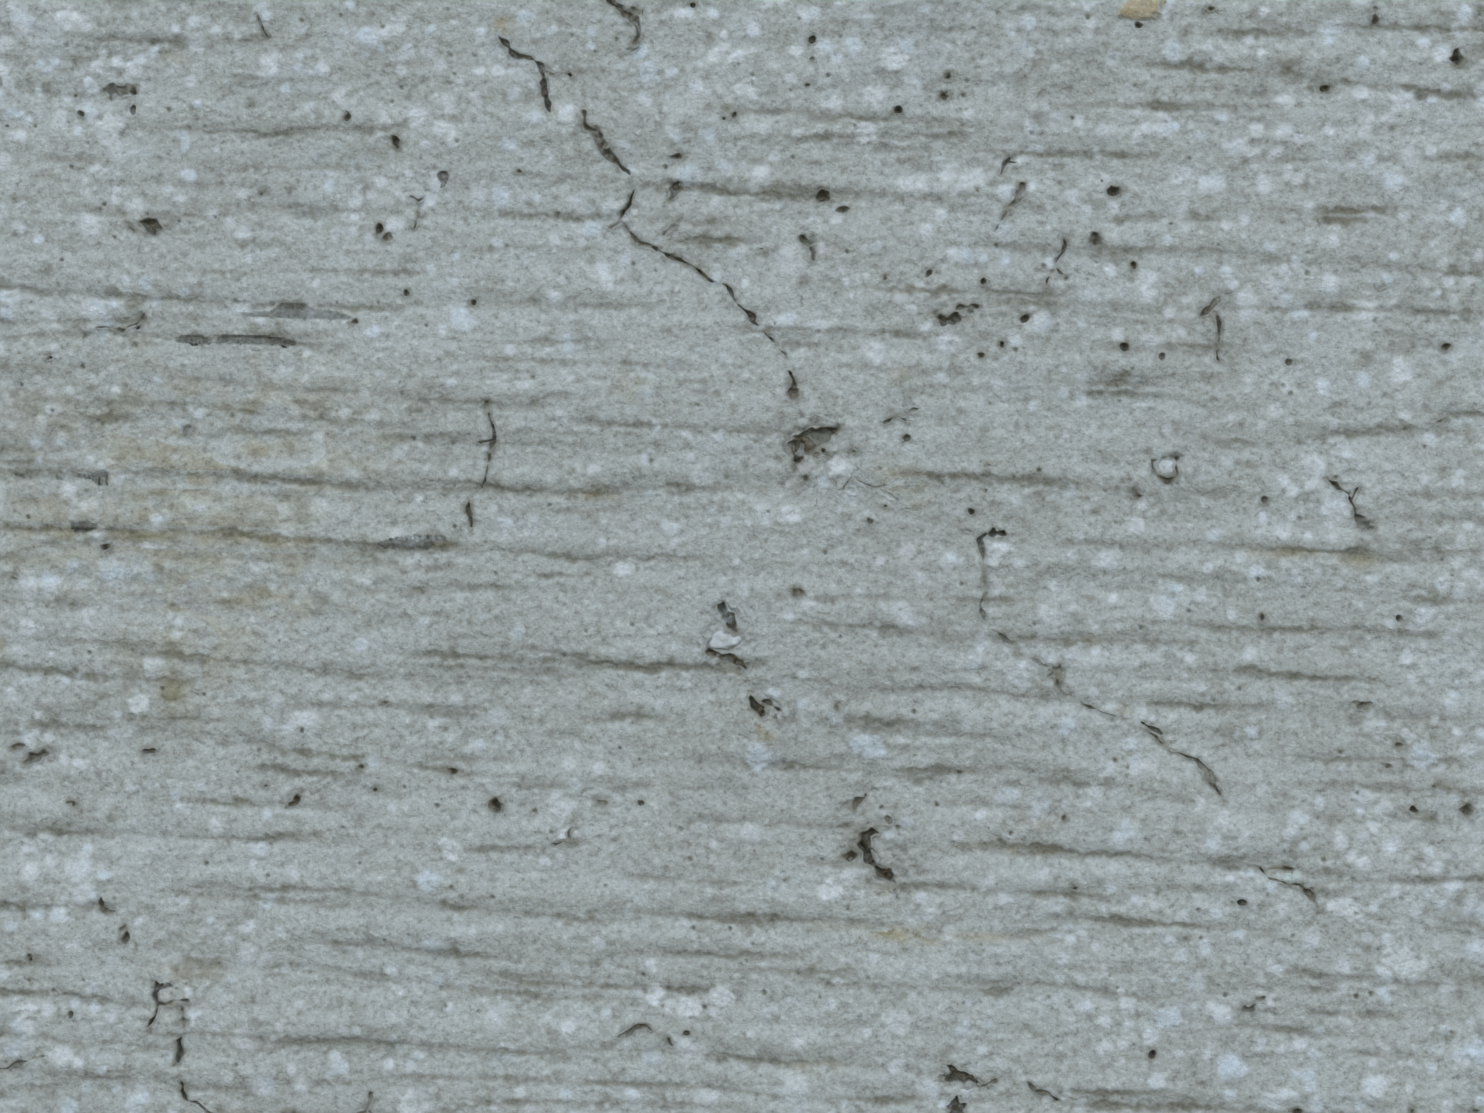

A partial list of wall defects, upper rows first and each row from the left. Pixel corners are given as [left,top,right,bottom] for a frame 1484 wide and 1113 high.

crack [497,33,799,388]
crack [797,234,817,263]
crack [853,476,1226,802]
crack [145,978,216,1113]
crack [975,1077,1061,1103]